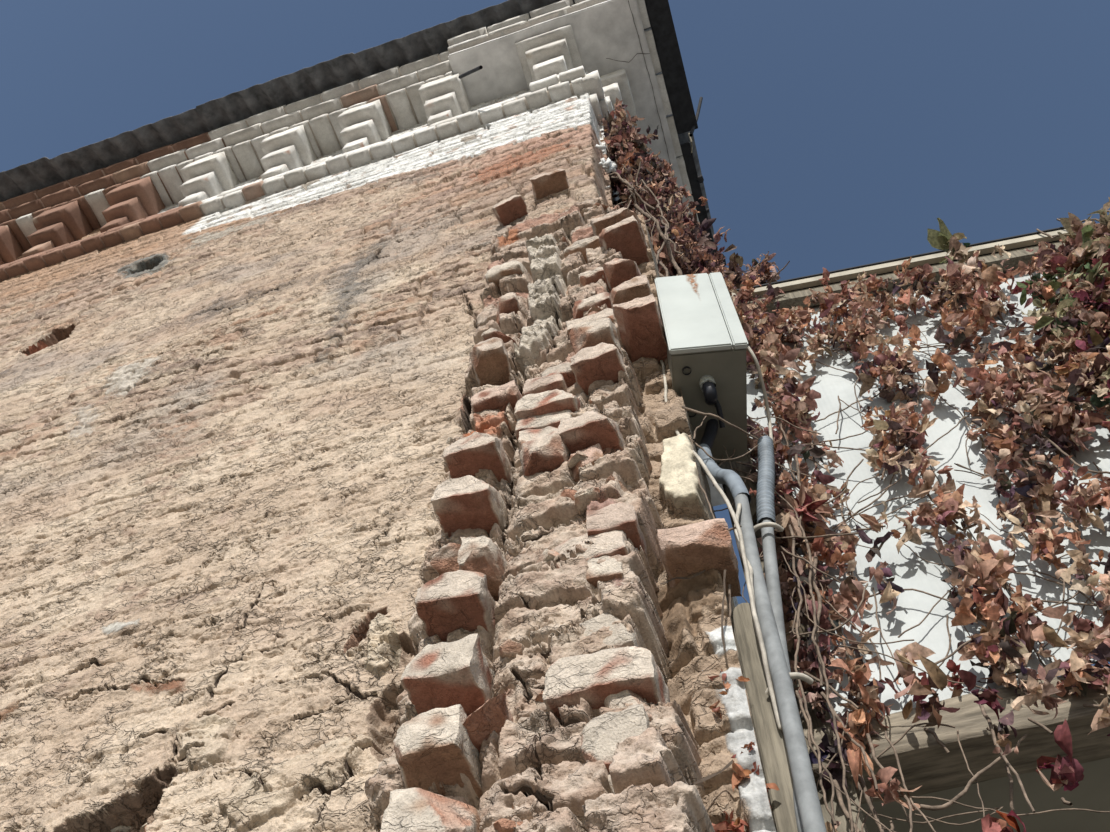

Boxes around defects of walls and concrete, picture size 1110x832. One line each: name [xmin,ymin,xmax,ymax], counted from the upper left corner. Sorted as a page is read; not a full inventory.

flaking render [497,229,518,246]
spalling [17,324,75,356]
flaking render [460,395,511,437]
crack [65,588,302,716]
peeling [708,625,737,654]
crack [263,674,378,739]
spalling [365,631,418,762]
crack [141,730,198,762]
spalling [53,765,178,832]
crack [215,770,264,785]
crack [300,746,370,831]